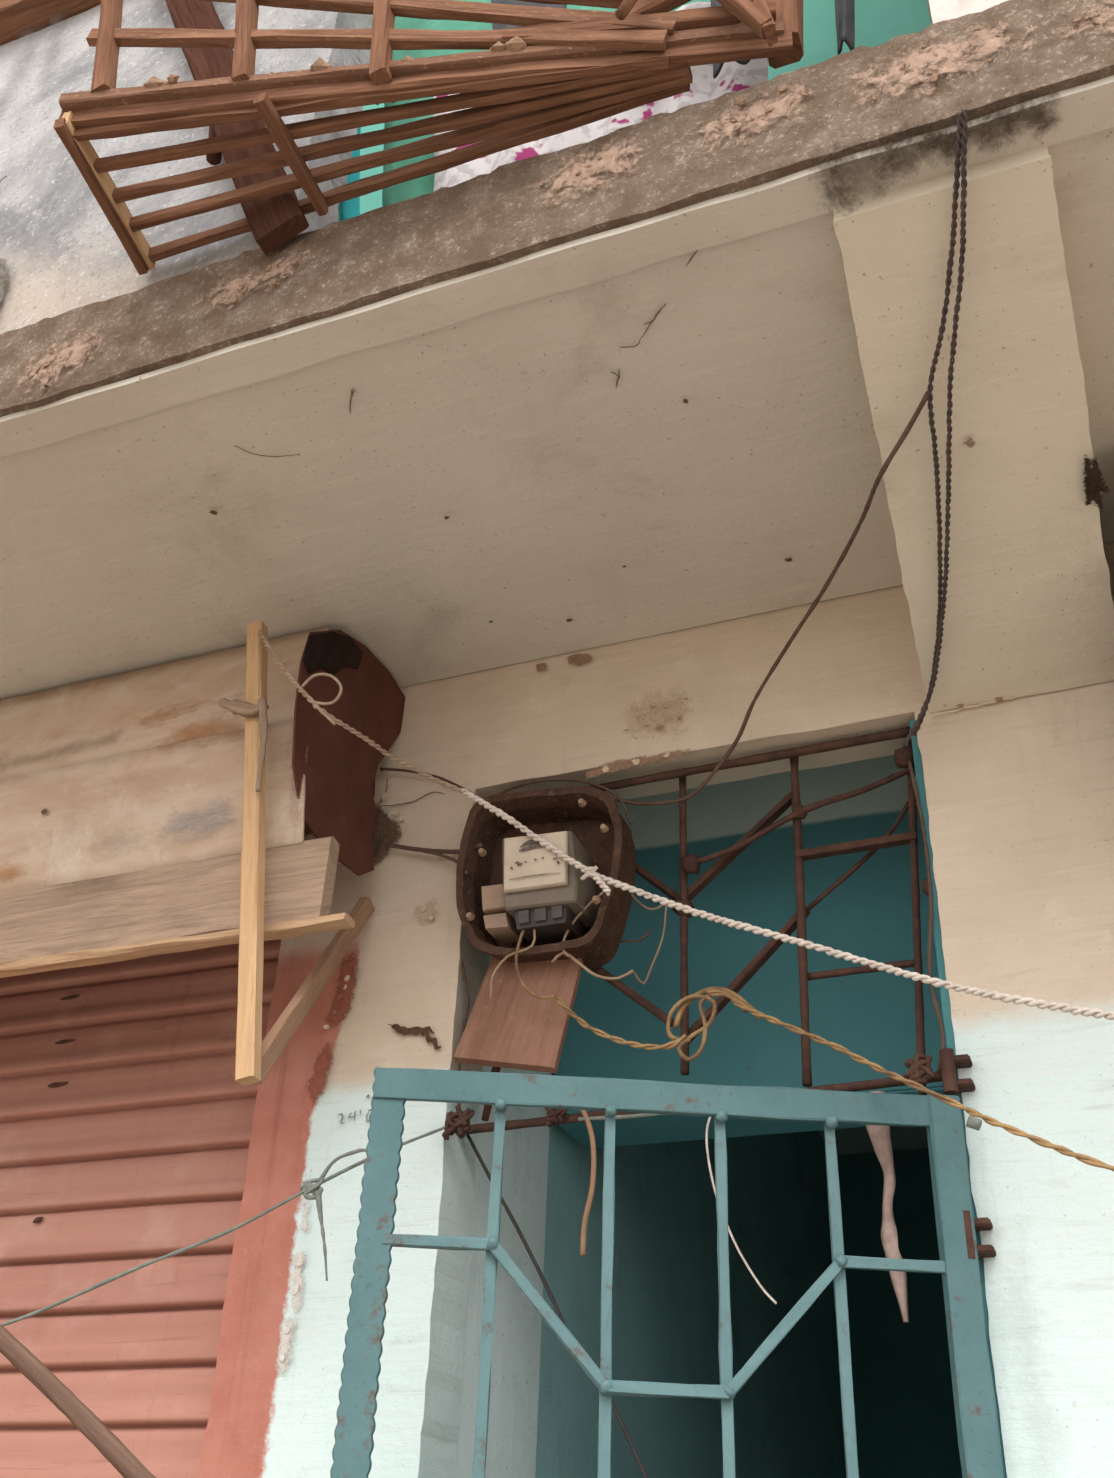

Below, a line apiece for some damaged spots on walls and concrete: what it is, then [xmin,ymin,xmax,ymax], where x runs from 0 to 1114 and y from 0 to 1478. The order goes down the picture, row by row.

spalling [1060,0,1114,37]
spalling [848,20,1037,108]
damp [818,87,1059,211]
spalling [17,325,106,393]
crack [388,1024,442,1050]